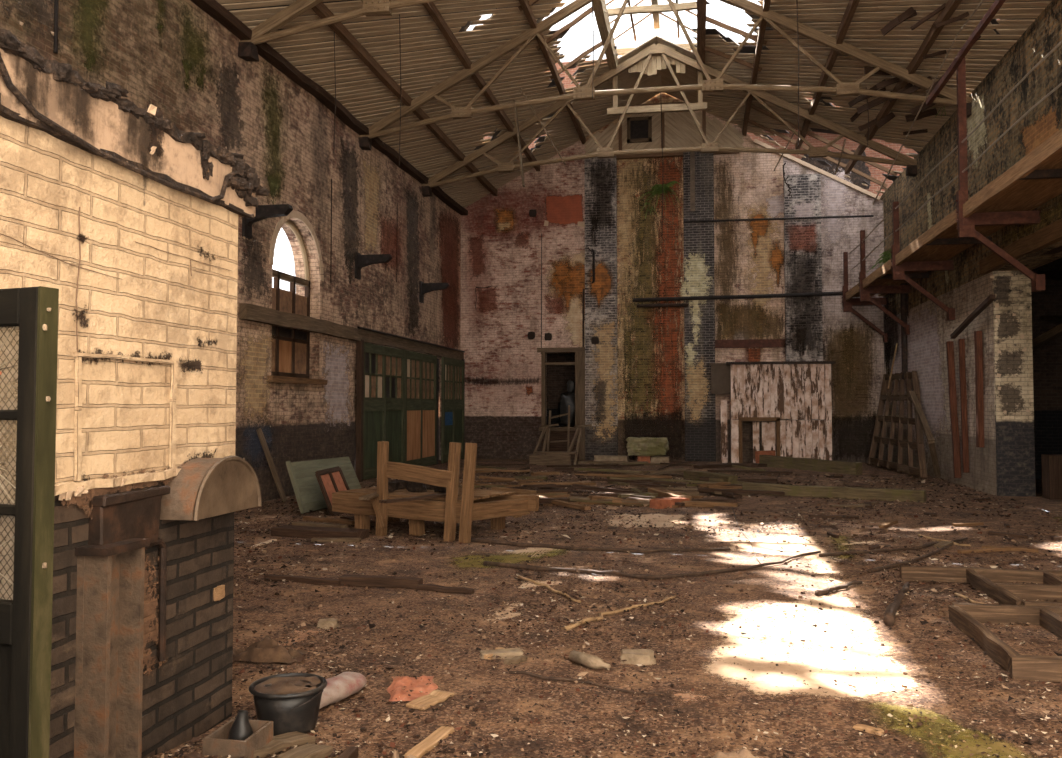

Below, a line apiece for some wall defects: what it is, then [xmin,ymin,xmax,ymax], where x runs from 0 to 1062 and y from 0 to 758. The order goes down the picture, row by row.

spalling [498,223,531,249]
spalling [544,295,566,314]
leakage [546,160,618,347]
peeling [589,158,650,442]
leakage [622,250,728,460]
leakage [744,205,826,361]